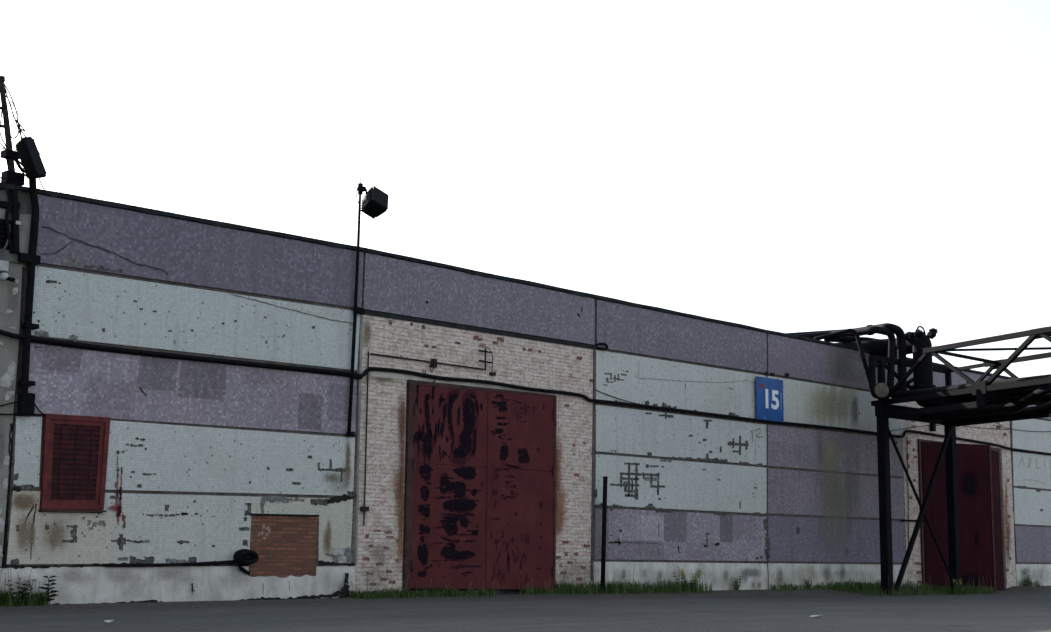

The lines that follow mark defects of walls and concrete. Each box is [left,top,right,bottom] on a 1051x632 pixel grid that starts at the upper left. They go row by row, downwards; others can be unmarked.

crack [41,226,169,275]
peeling [0,361,16,400]
spalling [2,456,34,492]
spalling [0,467,198,569]
spalling [239,455,356,546]
corrosion [396,403,405,558]
peeling [556,540,590,581]
spalling [594,410,762,513]
spalling [753,512,771,560]